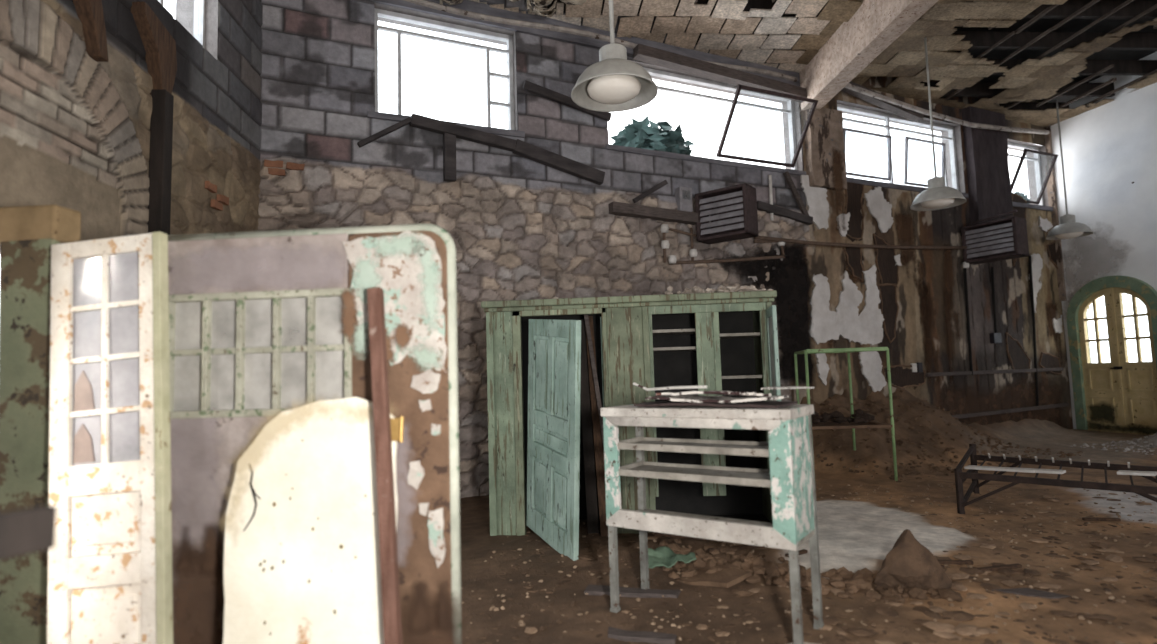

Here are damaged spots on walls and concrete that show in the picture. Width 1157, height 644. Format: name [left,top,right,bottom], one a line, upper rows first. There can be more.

peeling [800,175,926,392]
peeling [1012,193,1058,313]
peeling [1053,315,1063,333]